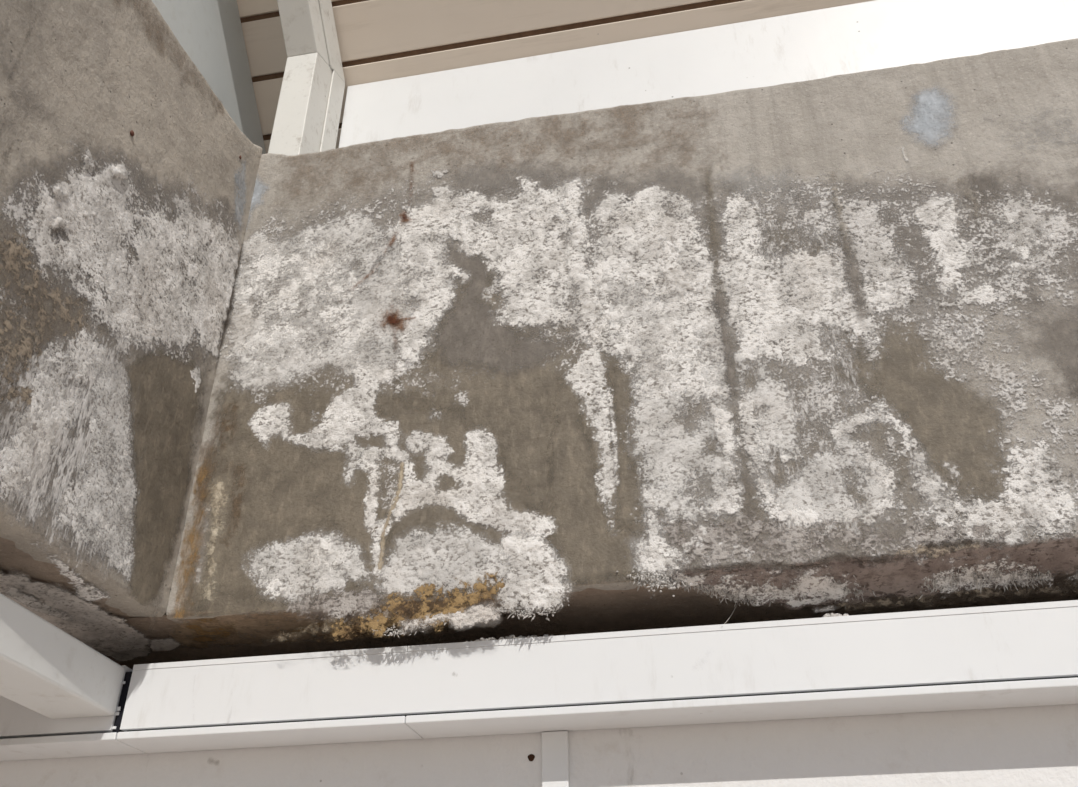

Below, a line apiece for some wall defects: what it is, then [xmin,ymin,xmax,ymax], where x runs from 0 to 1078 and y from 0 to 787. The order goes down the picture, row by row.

rust [382,311,416,341]
leakage [0,140,1078,642]
rust [170,446,454,649]